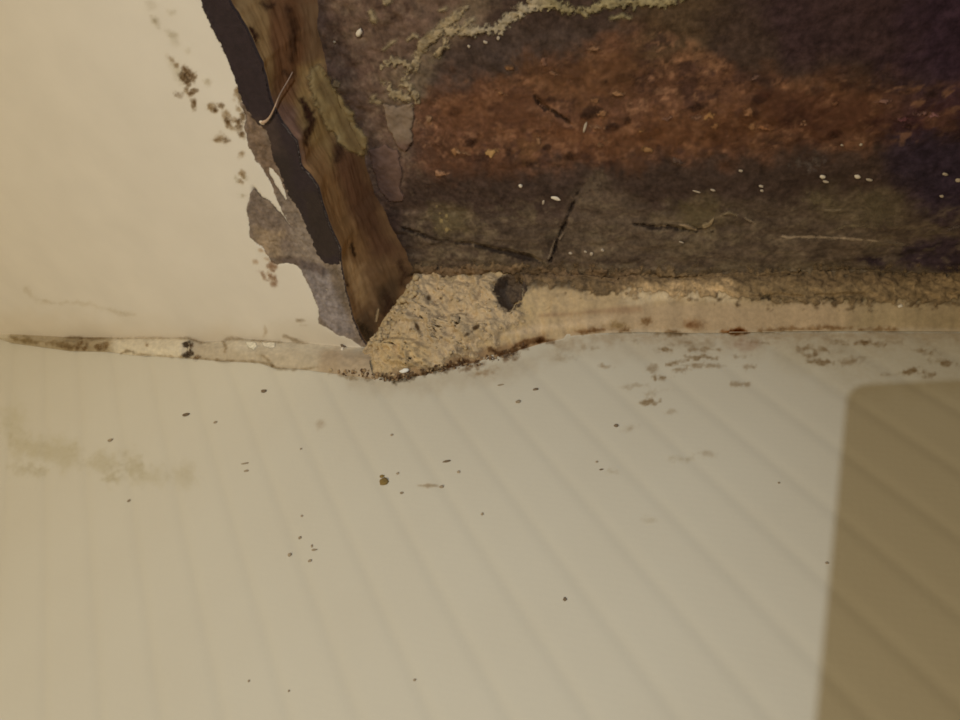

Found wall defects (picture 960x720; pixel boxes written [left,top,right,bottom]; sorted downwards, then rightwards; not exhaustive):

water stain [370,0,685,106]
water stain [300,98,315,143]
crack [455,191,579,263]
spalling [201,0,960,377]
water stain [781,198,881,242]
water stain [358,323,371,342]